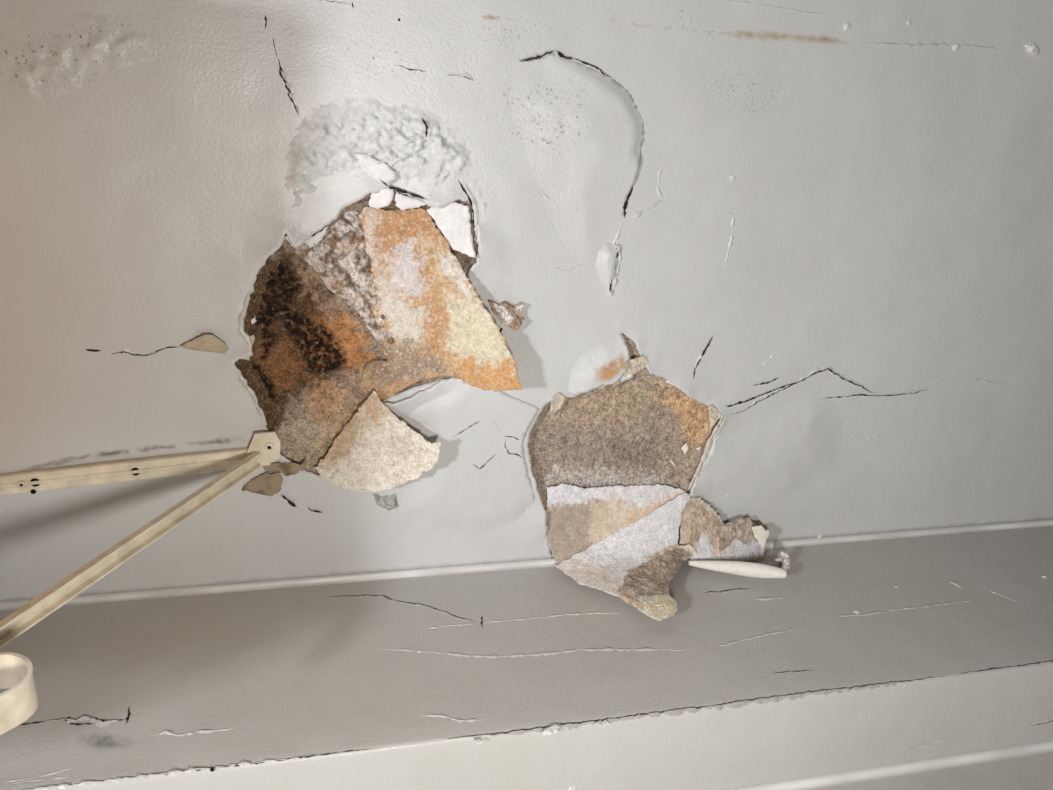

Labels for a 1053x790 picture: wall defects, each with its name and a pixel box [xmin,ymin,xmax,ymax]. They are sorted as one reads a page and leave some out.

crack [264,16,300,116]
crack [519,50,610,77]
crack [86,330,229,356]
flaking render [234,188,525,513]
crack [693,336,713,379]
crack [727,366,1031,415]
flaking render [528,334,790,621]
crack [328,595,618,629]
crack [20,707,130,728]
crack [449,660,1053,740]
crack [196,748,376,771]